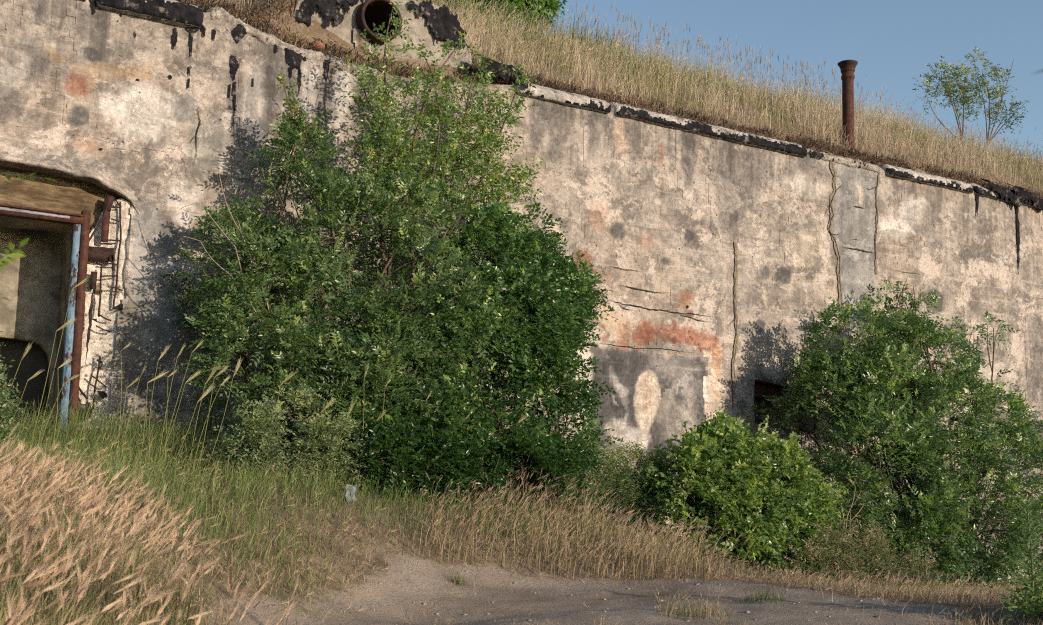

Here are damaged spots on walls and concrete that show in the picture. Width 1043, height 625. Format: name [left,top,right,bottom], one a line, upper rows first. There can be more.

water stain [0,0,216,152]
water stain [154,24,389,240]
water stain [586,340,646,453]
crack [589,337,684,352]
corrosion [569,241,726,353]
crack [610,241,739,409]
crack [826,153,924,334]